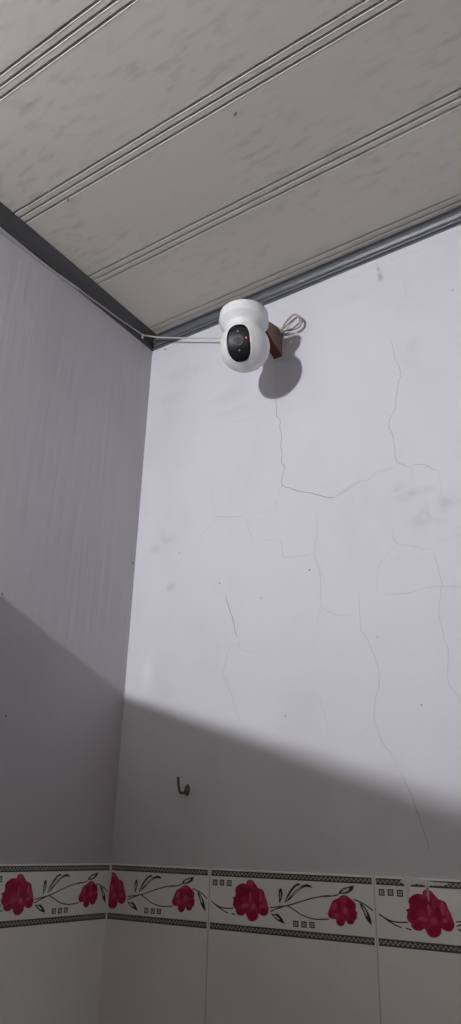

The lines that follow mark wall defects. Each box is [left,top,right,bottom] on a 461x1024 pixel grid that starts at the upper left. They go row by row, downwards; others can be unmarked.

crack [246,338,461,852]